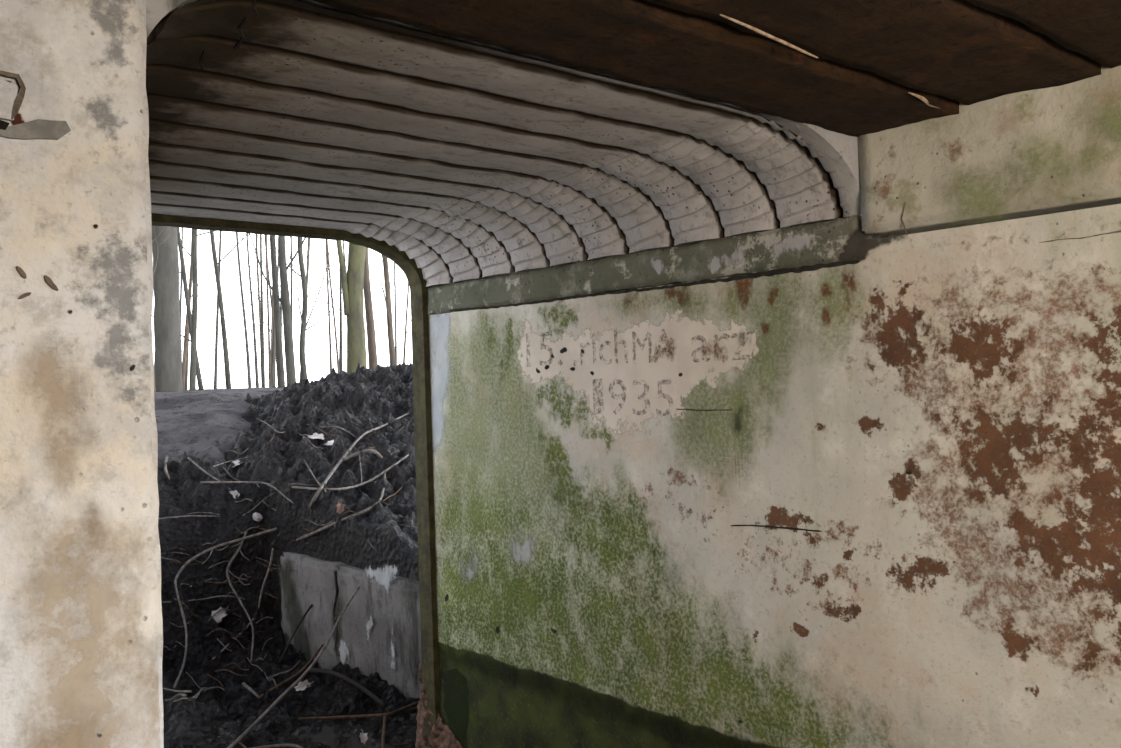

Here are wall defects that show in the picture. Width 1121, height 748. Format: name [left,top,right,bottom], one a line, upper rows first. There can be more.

spalling [0,70,71,140]
crack [1039,230,1121,243]
leakage [429,313,450,451]
leakage [510,534,535,565]
leakage [438,642,776,748]